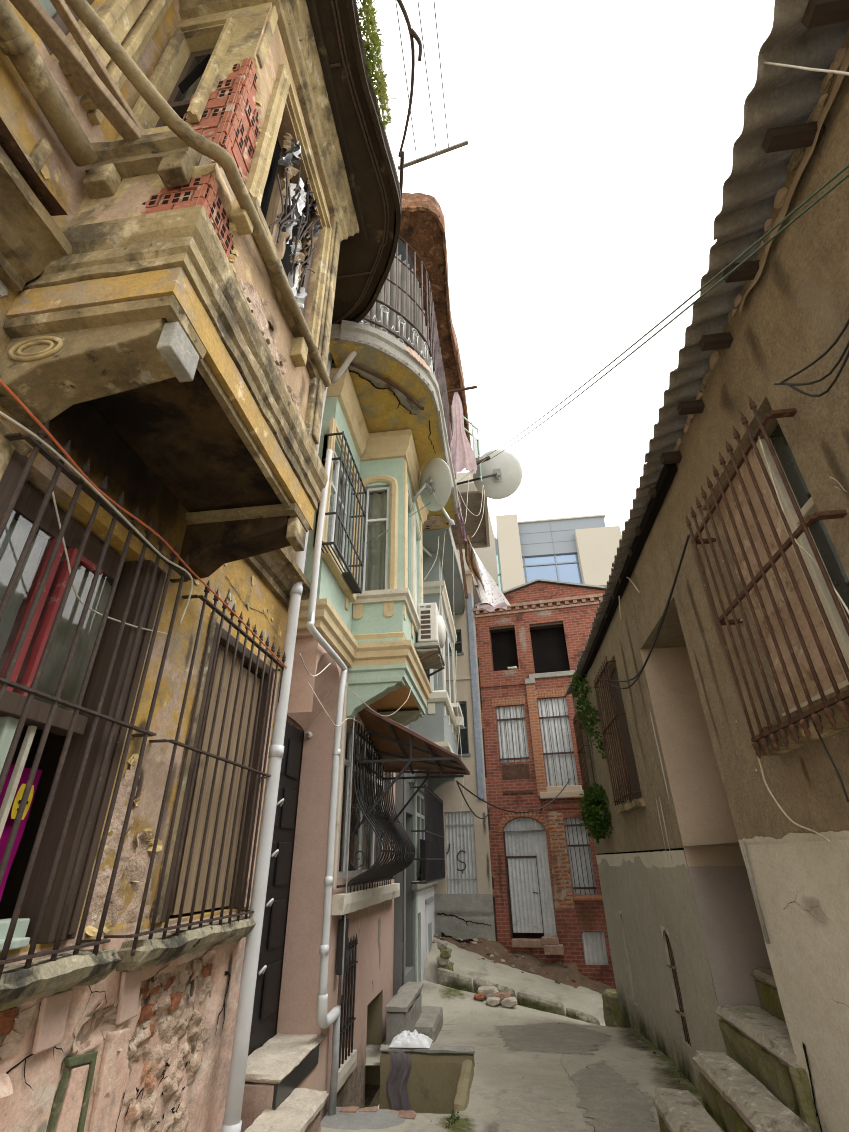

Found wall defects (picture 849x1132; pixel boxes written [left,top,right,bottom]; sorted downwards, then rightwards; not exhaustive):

crack [349,370,436,454]
spalling [0,1003,41,1061]
crack [6,1046,64,1090]
spalling [52,950,216,1132]